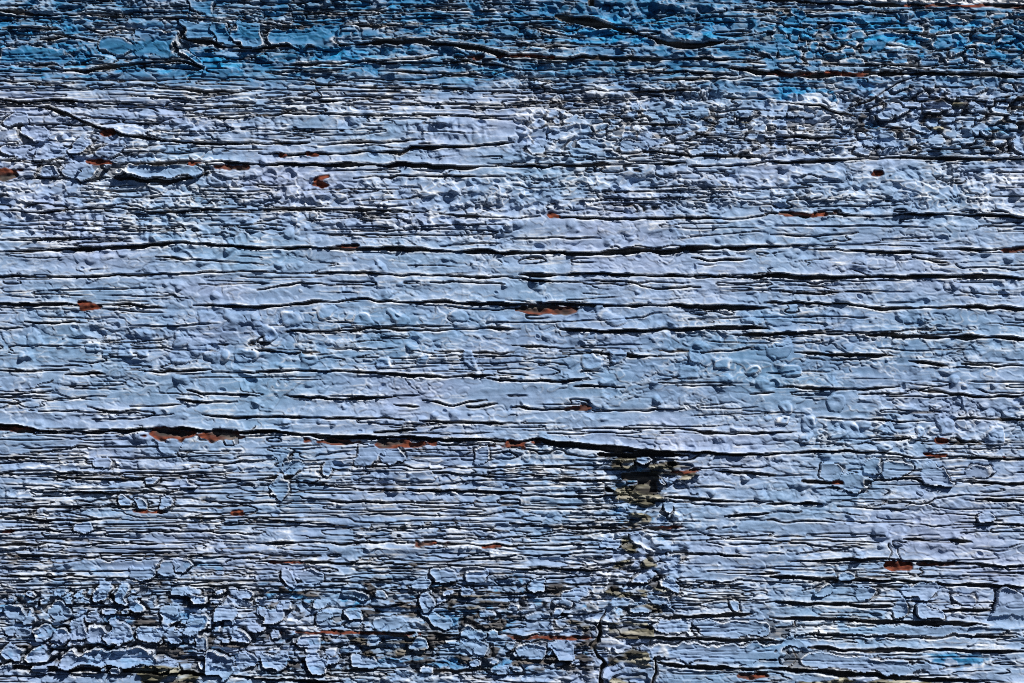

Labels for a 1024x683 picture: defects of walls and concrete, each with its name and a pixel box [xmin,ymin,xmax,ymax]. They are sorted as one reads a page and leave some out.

crack [0,0,1024,184]
peeling [0,0,1024,187]
peeling [394,135,461,200]
peeling [783,286,805,342]
peeling [58,510,94,534]
peeling [118,494,175,510]
peeling [148,439,183,454]
peeling [261,419,307,504]
peeling [354,439,411,488]
crack [0,208,1024,683]
peeling [588,417,1024,683]
peeling [0,547,592,683]